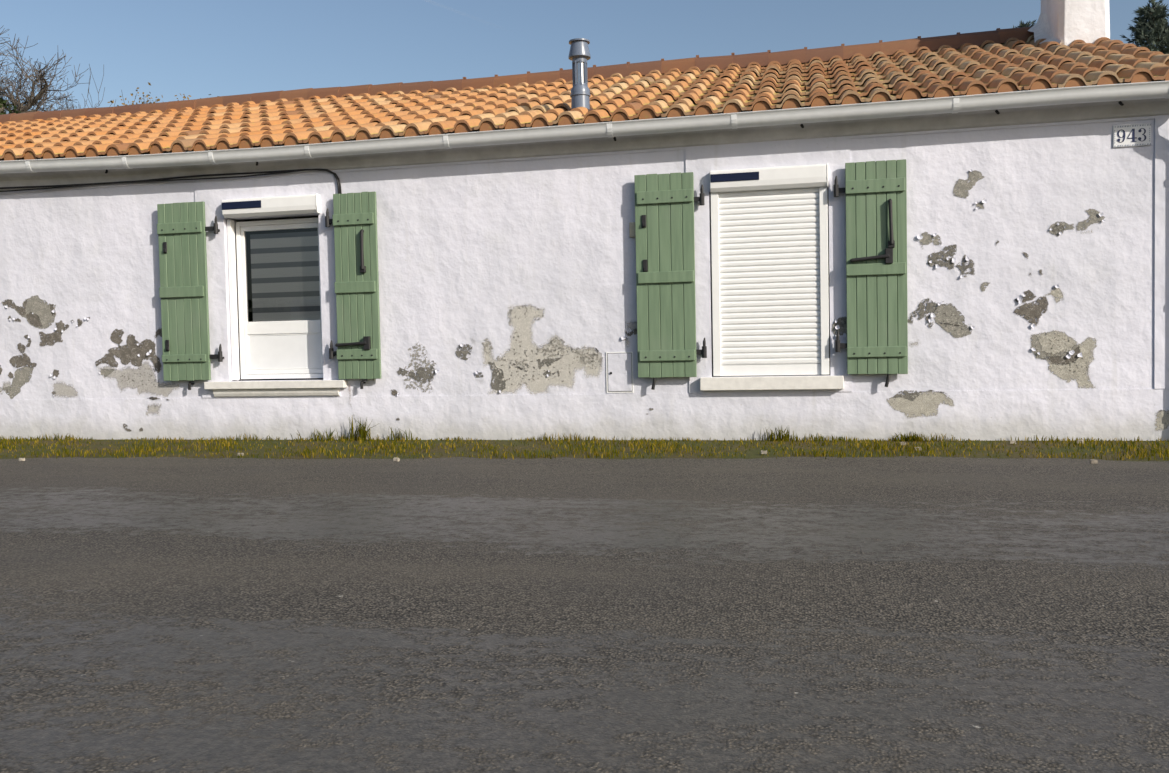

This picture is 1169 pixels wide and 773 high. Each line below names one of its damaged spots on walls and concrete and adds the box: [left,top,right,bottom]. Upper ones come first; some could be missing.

peeling [953,170,987,209]
peeling [1049,209,1105,236]
peeling [917,232,989,291]
peeling [0,295,90,399]
peeling [95,328,178,415]
peeling [391,343,439,396]
peeling [456,305,602,394]
peeling [908,298,975,338]
peeling [1014,284,1096,388]
flaking render [887,390,954,418]